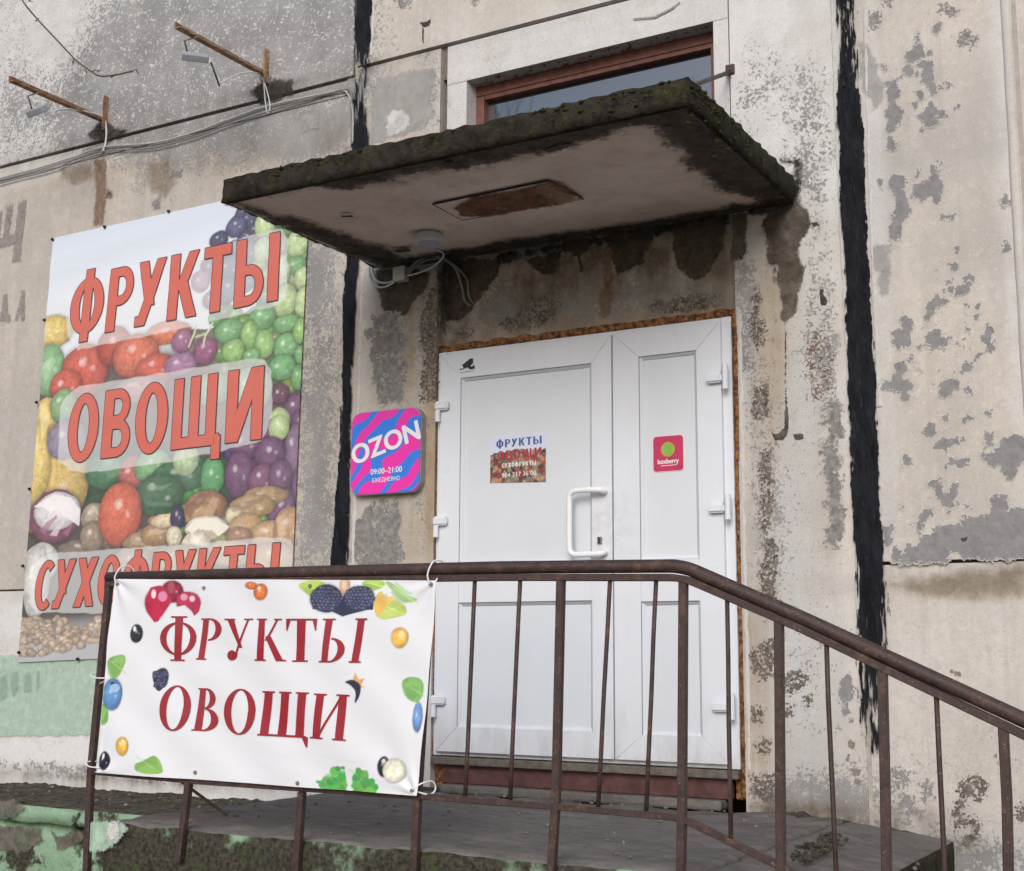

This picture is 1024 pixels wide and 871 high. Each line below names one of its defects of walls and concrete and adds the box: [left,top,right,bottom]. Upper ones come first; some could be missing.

peeling [867,0,892,32]
peeling [877,2,964,152]
peeling [956,28,979,51]
rust [454,183,581,218]
water stain [232,108,811,339]
peeling [875,160,959,246]
peeling [998,191,1012,209]
peeling [880,245,1024,567]